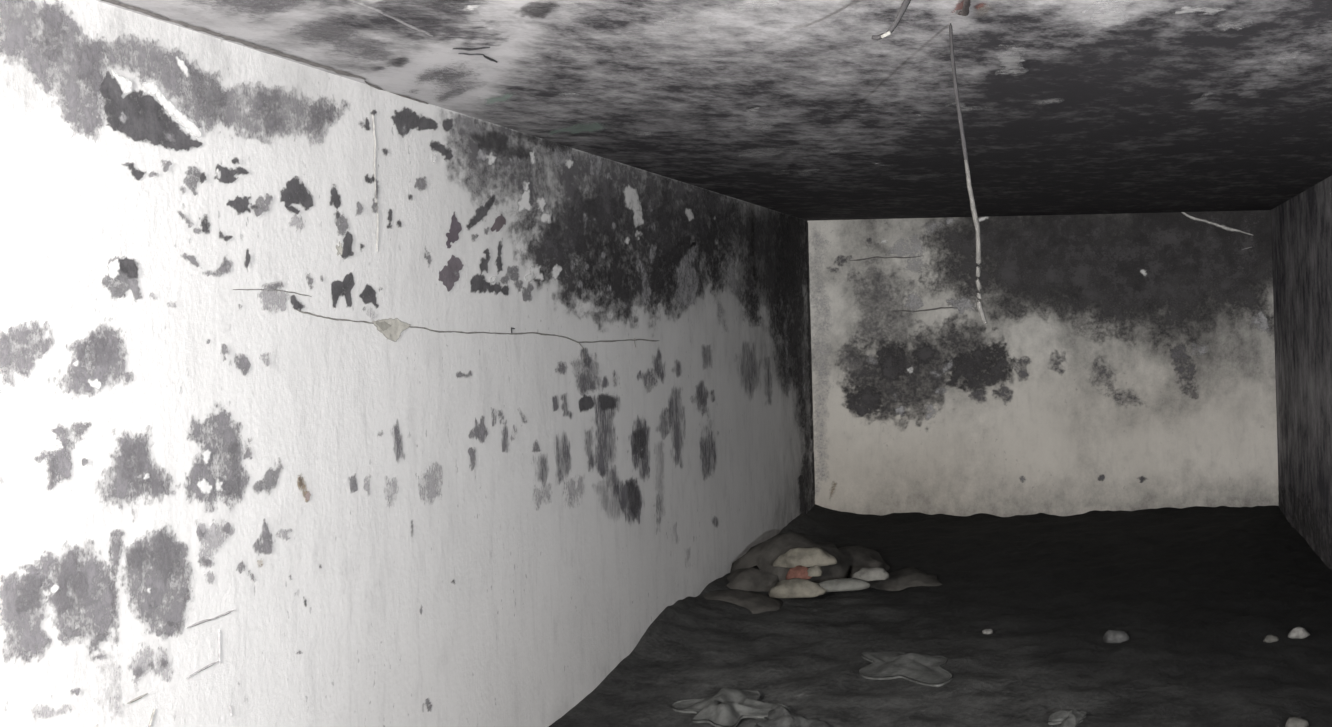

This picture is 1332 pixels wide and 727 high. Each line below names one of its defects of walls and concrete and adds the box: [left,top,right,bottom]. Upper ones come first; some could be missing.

peeling [102,257,176,306]
peeling [100,71,202,180]
leakage [0,0,347,144]
peeling [182,158,313,228]
peeling [306,174,410,341]
peeling [360,64,476,162]
crack [233,289,659,363]
peeling [424,149,611,301]
leakage [473,132,563,160]
leakage [843,273,1012,417]
leakage [1094,362,1141,405]
leakage [1170,345,1196,399]